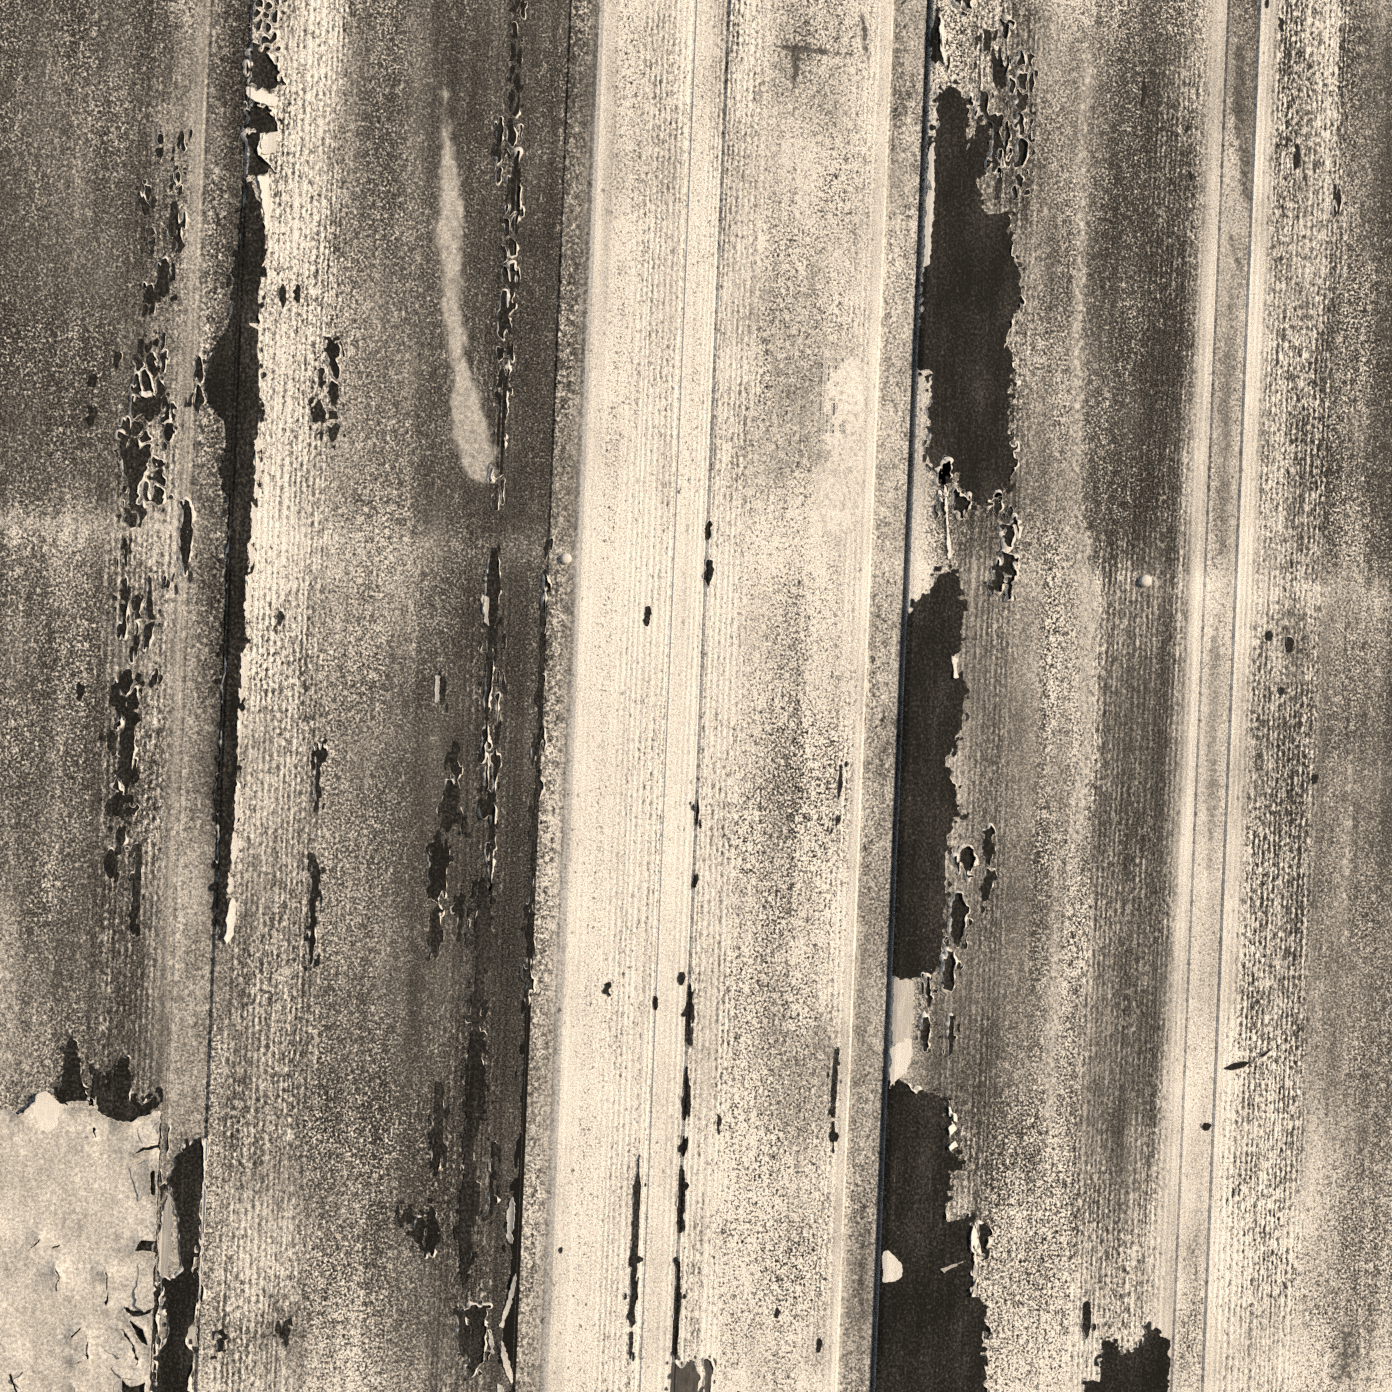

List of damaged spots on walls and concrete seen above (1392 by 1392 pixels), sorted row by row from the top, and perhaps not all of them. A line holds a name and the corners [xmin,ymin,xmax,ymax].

peeling [240,0,288,224]
peeling [308,335,347,450]
leakage [436,127,497,482]
leakage [1068,53,1094,478]
peeling [94,331,184,851]
peeling [875,15,1039,1392]
leakage [1069,531,1102,839]
leakage [1341,765,1353,943]
leakage [1041,944,1060,1147]
peeling [0,1037,163,1392]
peeling [1083,1321,1171,1392]
leakage [1333,1324,1361,1382]